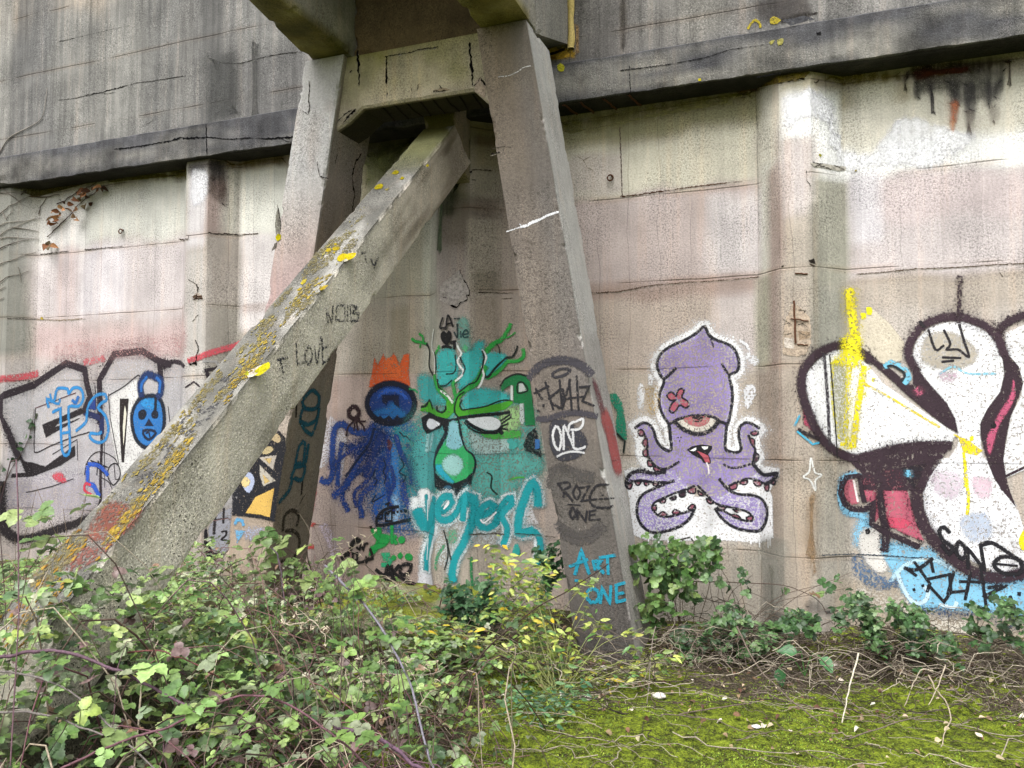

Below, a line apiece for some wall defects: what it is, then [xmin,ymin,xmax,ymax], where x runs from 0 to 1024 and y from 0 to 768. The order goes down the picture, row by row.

crack [468,42,531,86]
spalling [783,300,811,357]